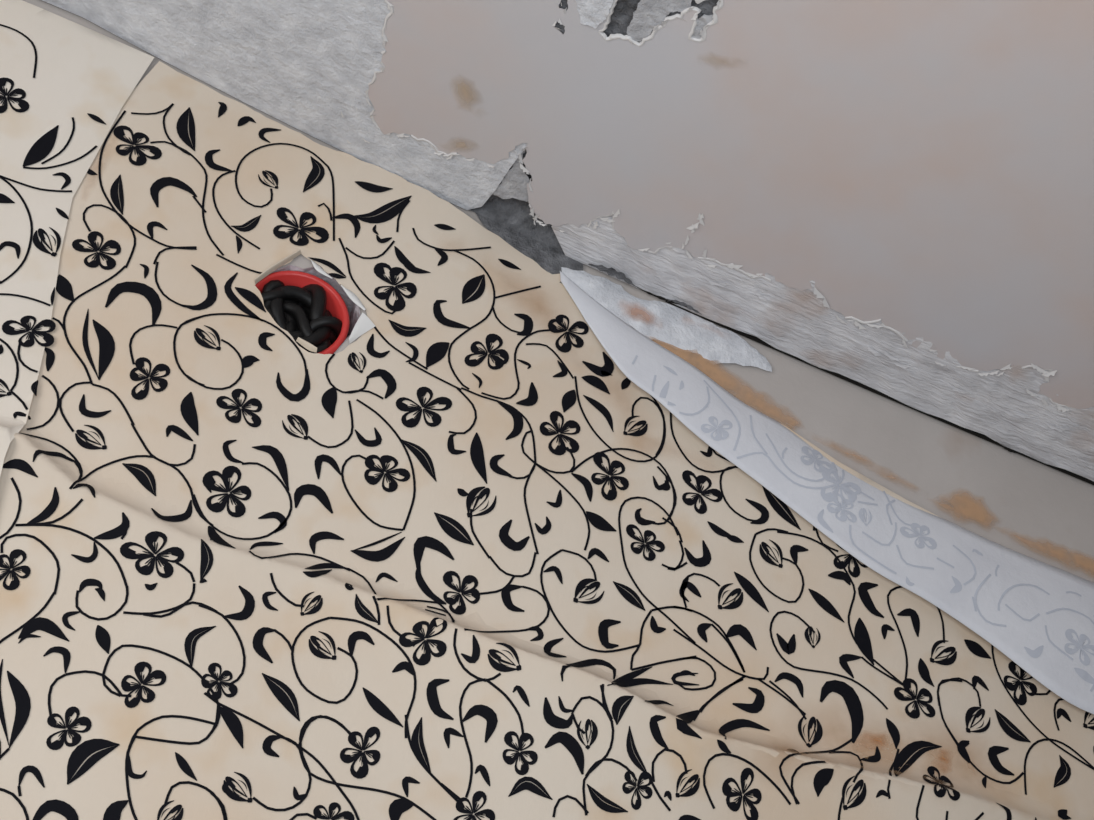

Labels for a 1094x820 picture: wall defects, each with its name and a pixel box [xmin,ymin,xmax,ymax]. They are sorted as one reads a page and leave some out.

peeling [42,0,1094,481]